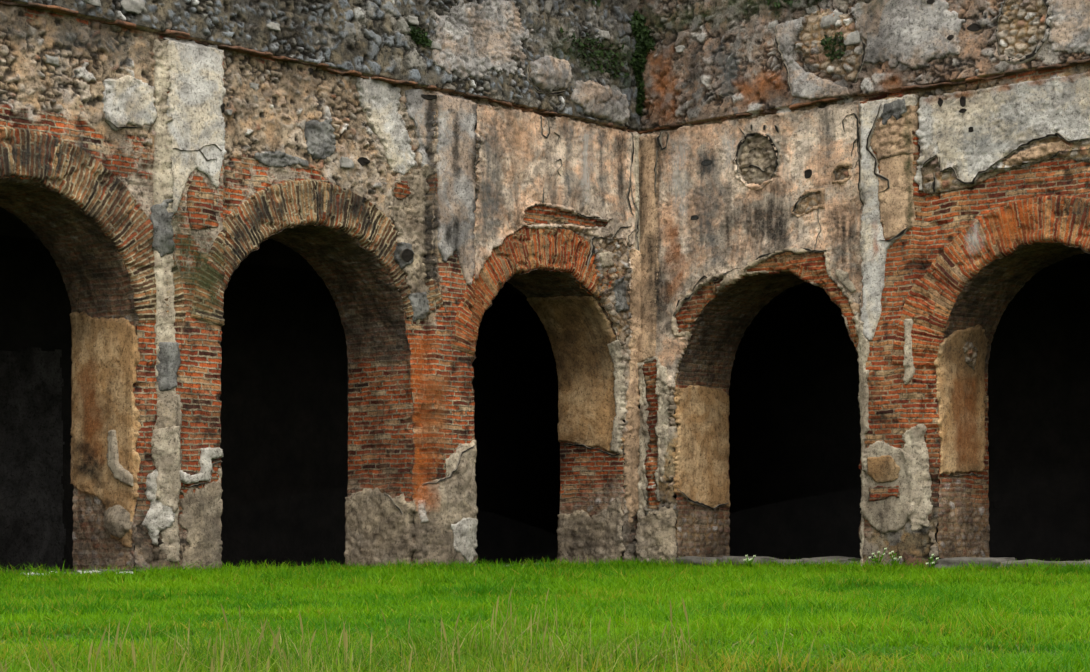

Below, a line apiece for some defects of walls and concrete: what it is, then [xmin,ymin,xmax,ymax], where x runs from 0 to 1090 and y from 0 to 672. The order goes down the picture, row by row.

flaking render [102,39,224,571]
water stain [425,101,460,275]
water stain [566,129,625,198]
flaking render [521,188,671,563]
water stain [639,138,684,317]
water stain [697,154,791,263]
flaking render [671,161,933,567]
spalling [866,99,1090,194]
flaking render [410,440,478,567]